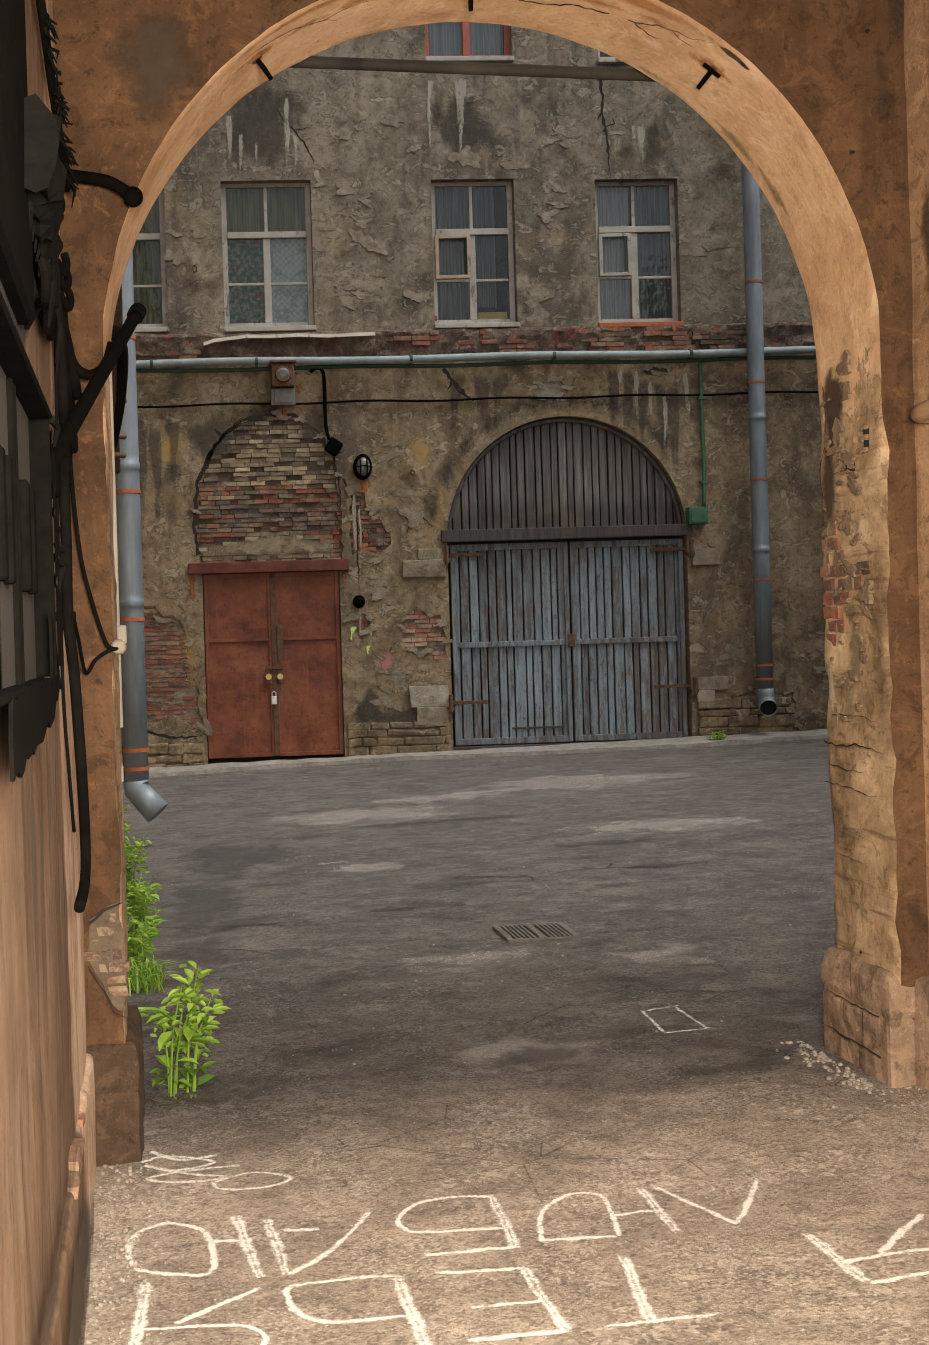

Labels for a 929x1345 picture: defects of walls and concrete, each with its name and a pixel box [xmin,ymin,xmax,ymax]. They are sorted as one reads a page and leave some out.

crack [519,0,709,47]
leakage [228,89,303,164]
peeling [307,159,424,312]
peeling [448,145,529,170]
peeling [534,184,574,229]
crack [597,80,615,179]
peeling [384,284,562,352]
flaking render [189,410,423,639]
flaking render [144,606,213,736]
flaking render [369,610,455,712]